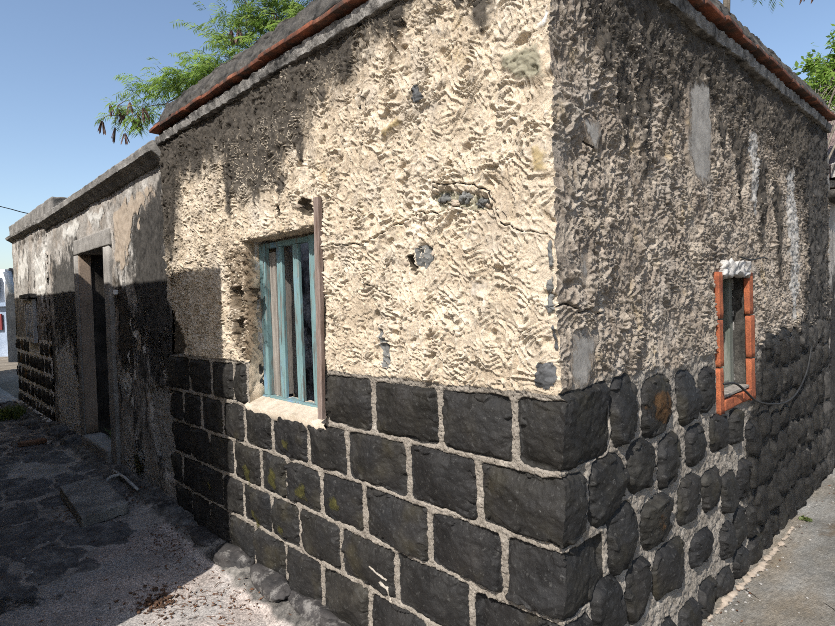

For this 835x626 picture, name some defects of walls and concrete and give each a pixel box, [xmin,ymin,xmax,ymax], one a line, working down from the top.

leakage [45,254,78,363]
spalling [172,310,187,355]
leakage [113,29,353,385]
spalling [404,245,434,269]
crack [327,182,548,300]
spalling [433,191,492,211]
leakage [583,0,835,531]